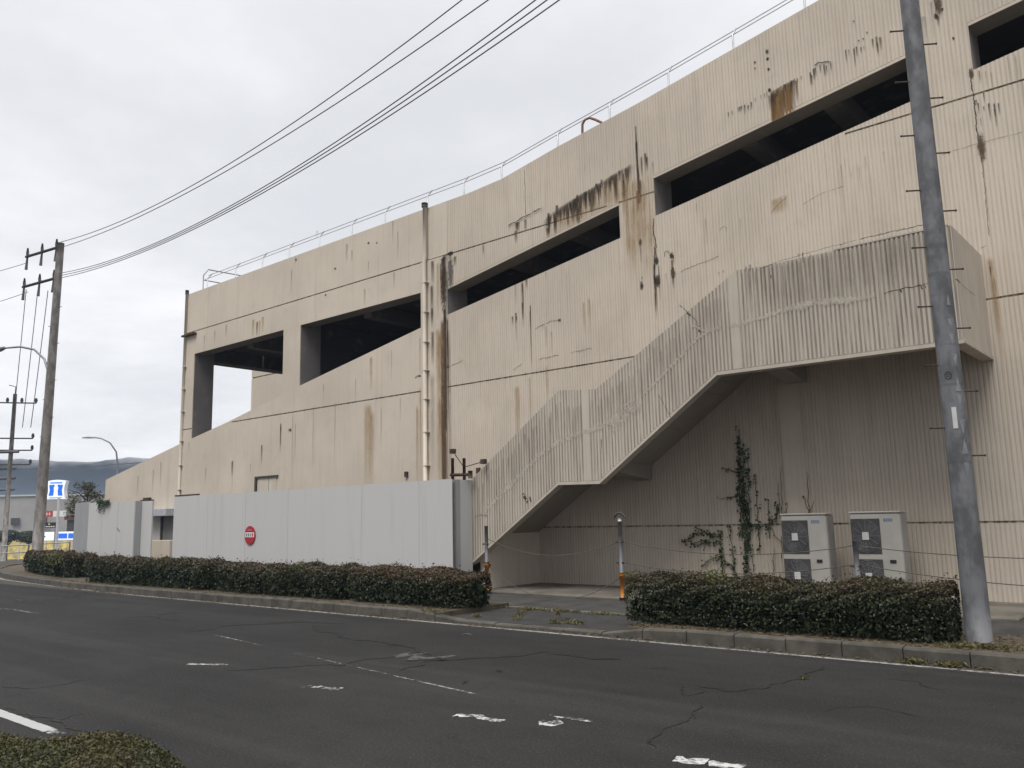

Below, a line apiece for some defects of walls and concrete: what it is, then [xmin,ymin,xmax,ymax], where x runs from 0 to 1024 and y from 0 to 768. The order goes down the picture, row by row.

corrosion [771,80,797,121]
damp [508,132,647,235]
crack [943,69,1020,248]